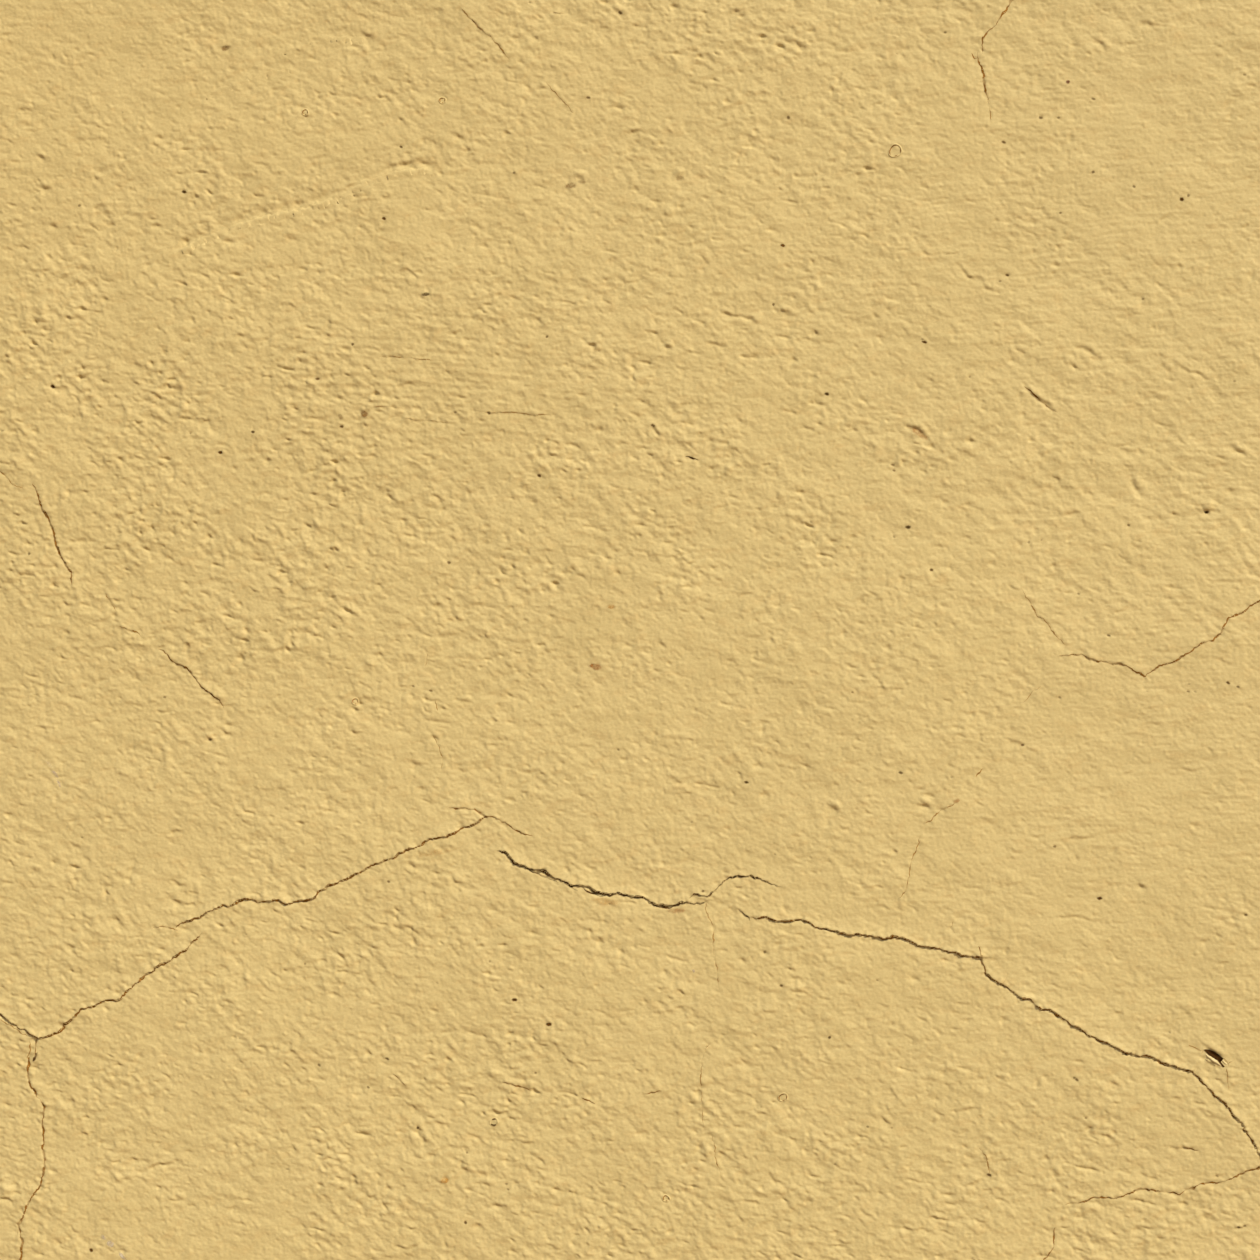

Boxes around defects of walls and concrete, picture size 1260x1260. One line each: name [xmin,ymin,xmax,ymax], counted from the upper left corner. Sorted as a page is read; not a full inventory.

crack [972,6,1009,119]
crack [0,471,72,583]
crack [105,593,223,706]
crack [1024,593,1260,677]
crack [0,807,776,1260]
crack [742,912,1260,1260]